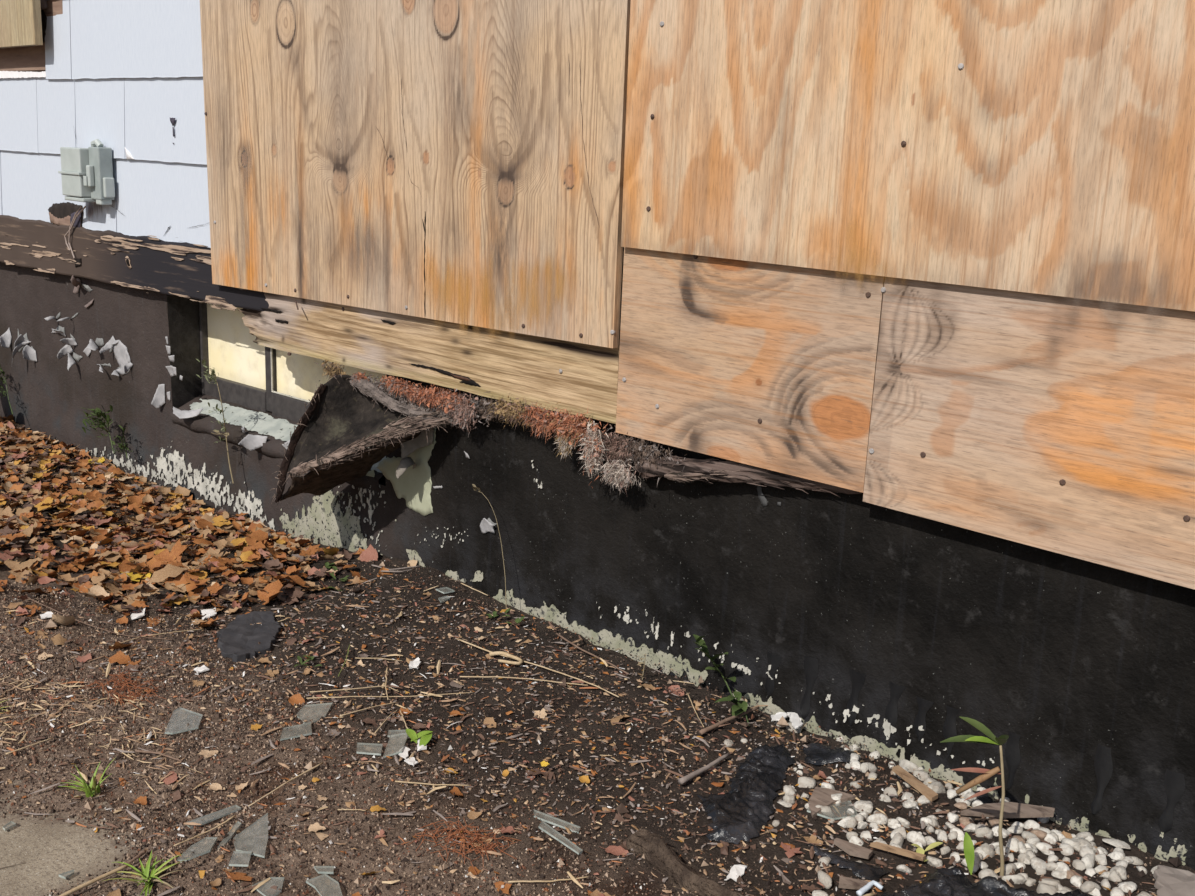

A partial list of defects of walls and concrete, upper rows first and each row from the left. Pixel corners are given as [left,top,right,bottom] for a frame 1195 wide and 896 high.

peeling [0,235,211,376]
peeling [79,337,497,567]
peeling [492,589,999,799]
peeling [1025,794,1187,865]